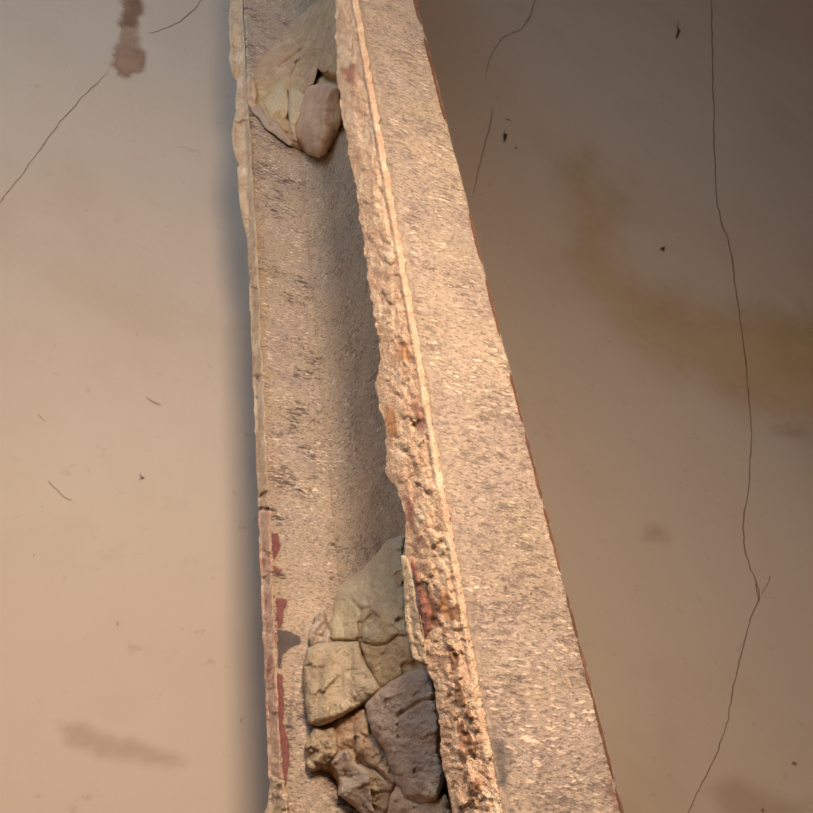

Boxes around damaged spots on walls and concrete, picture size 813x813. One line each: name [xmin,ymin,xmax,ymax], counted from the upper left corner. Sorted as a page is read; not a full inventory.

spalling [251,84,304,147]
spalling [413,572,424,647]
spalling [448,603,461,621]
peeling [258,510,289,784]
spalling [448,645,460,669]
spalling [447,682,480,804]
peeling [330,749,376,813]